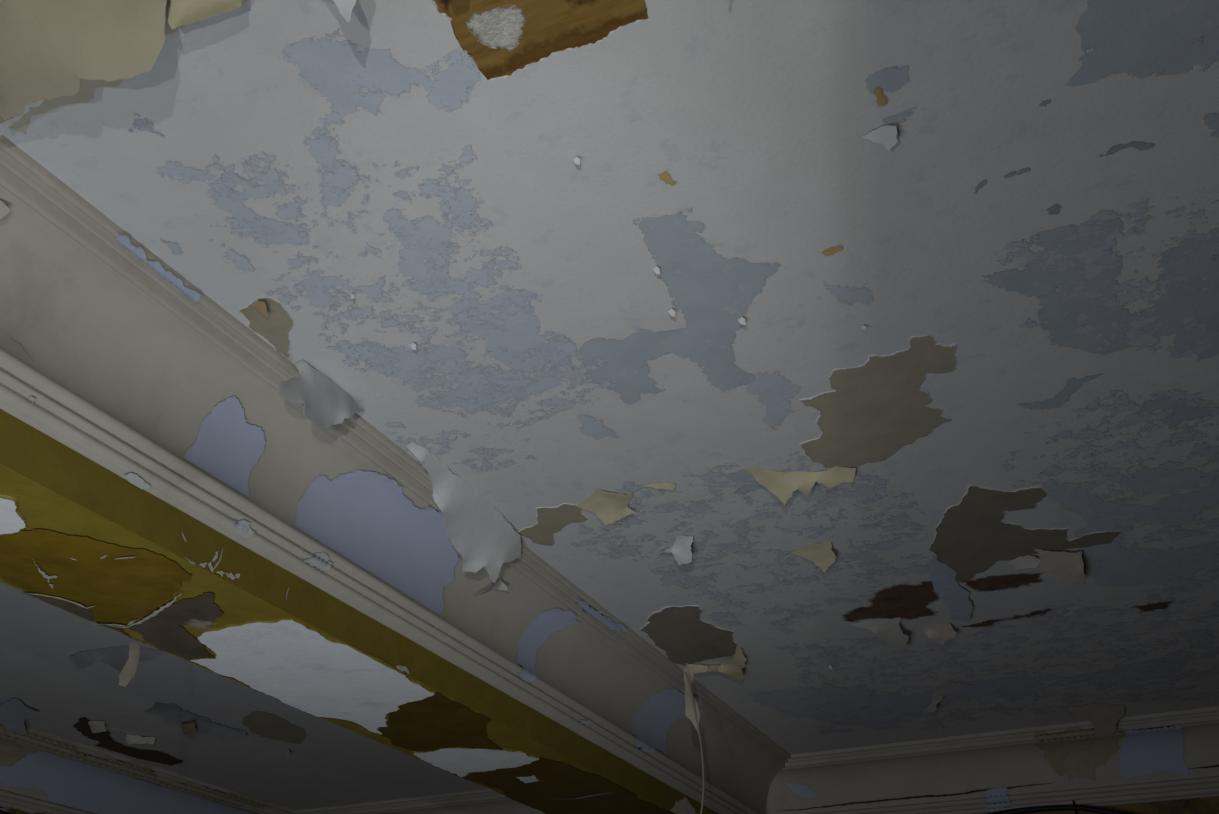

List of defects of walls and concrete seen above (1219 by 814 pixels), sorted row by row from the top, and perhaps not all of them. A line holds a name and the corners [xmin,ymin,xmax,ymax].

peeling [0,0,248,138]
peeling [325,0,357,23]
peeling [426,49,481,112]
peeling [1064,0,1219,86]
peeling [157,135,786,616]
peeling [724,334,958,506]
peeling [0,494,28,536]
peeling [792,541,836,573]
peeling [922,485,1122,645]
peeling [0,592,698,814]
peeling [516,598,746,759]